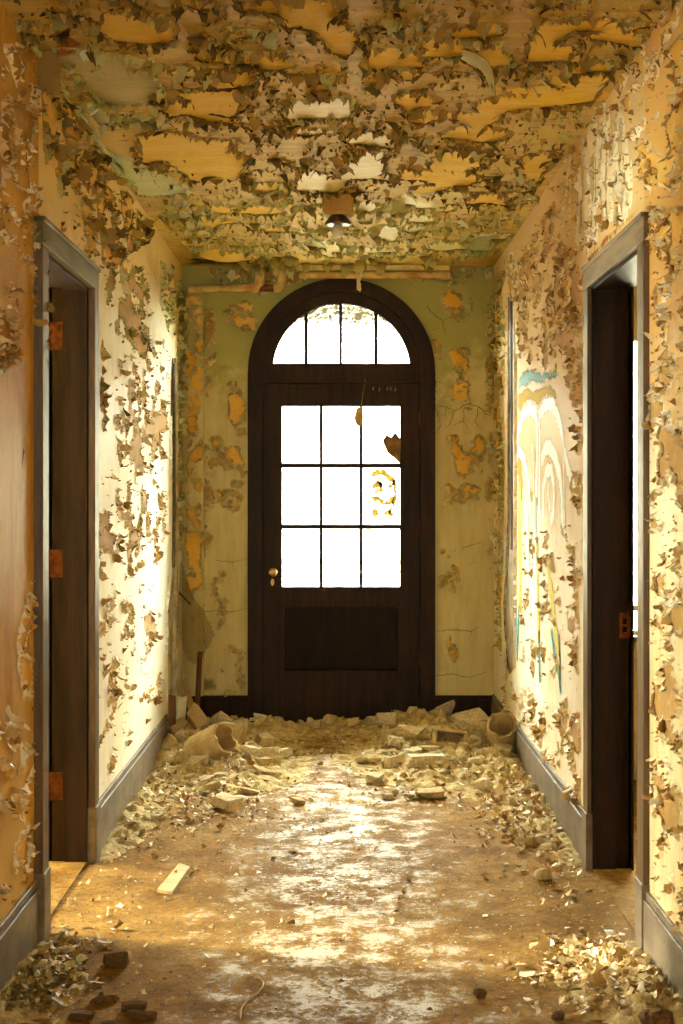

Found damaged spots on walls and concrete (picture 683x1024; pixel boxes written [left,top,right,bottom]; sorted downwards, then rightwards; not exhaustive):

peeling [0,0,683,805]
crack [435,372,510,677]
crack [504,297,512,352]
peeling [0,581,40,905]
peeling [641,539,683,934]